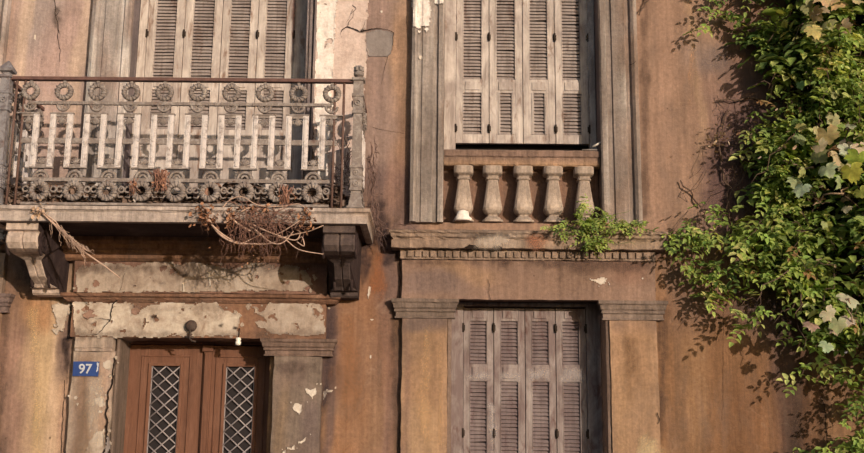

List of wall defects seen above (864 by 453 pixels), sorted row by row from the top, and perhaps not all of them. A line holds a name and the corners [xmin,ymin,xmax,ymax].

peeling [411,0,444,33]
flaking render [312,0,369,196]
peeling [52,262,330,339]
flaking render [68,392,107,413]
peeling [305,383,336,399]
flaking render [85,429,112,453]